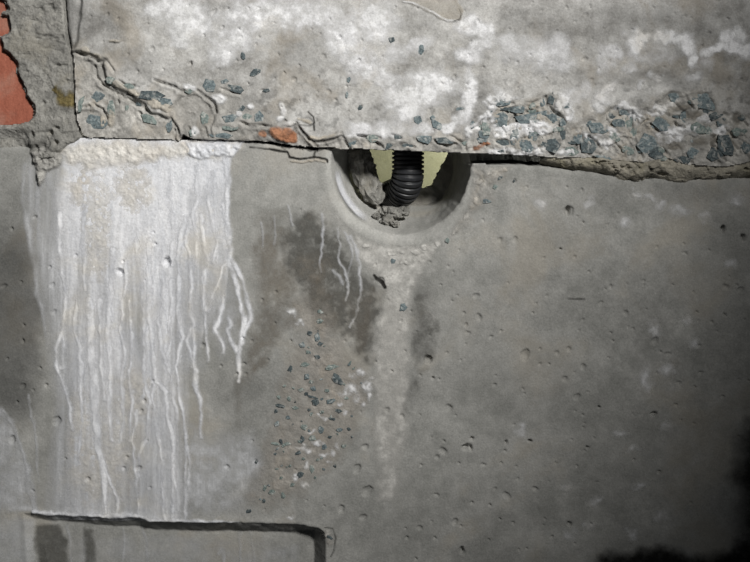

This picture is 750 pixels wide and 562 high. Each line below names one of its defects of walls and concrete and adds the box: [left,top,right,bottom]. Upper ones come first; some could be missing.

crack [251,114,345,163]
spalling [289,91,750,166]
damp [0,138,261,562]
damp [260,213,433,499]